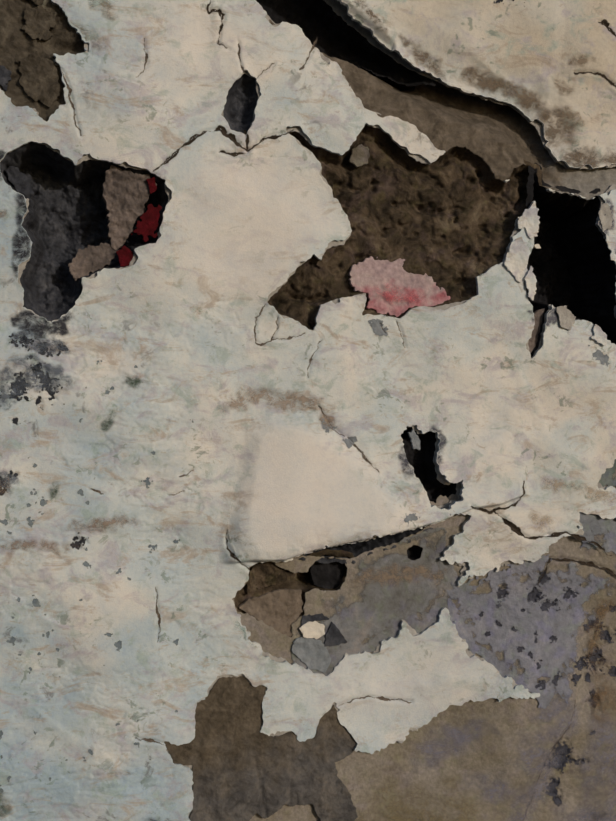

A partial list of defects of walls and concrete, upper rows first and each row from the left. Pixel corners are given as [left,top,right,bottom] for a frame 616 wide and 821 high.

peeling [0,0,85,122]
crack [61,71,82,136]
crack [206,3,273,79]
spalling [223,74,258,134]
crack [299,38,317,70]
crack [574,72,616,87]
crack [153,125,293,171]
spalling [268,124,542,330]
peeling [598,203,616,264]
spalling [401,427,458,507]
peeling [164,512,616,821]
crack [342,695,411,705]